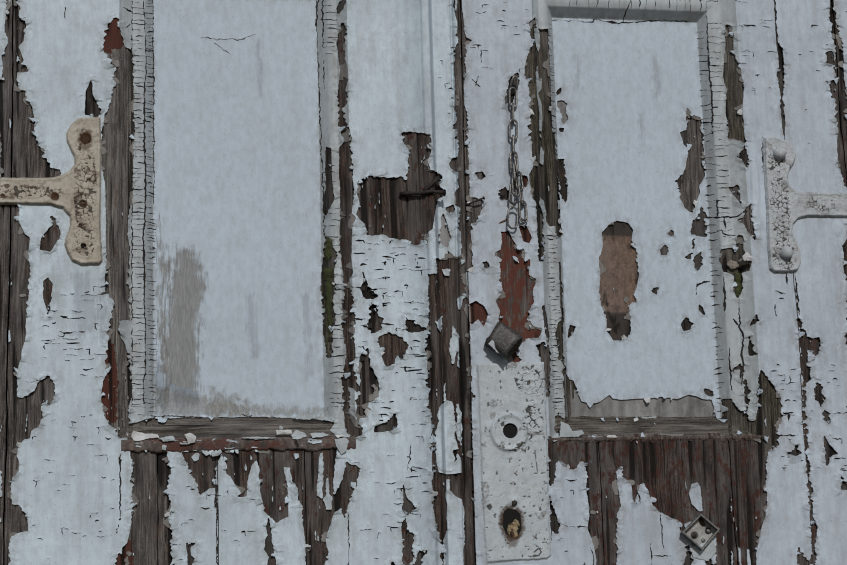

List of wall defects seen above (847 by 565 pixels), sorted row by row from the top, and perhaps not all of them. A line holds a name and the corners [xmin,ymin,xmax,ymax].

peeling [0,205,55,565]
peeling [0,0,61,178]
crack [43,285,109,376]
crack [126,0,202,420]
leakage [157,249,206,396]
crack [170,456,254,565]
peeling [85,18,361,565]
crack [292,0,433,565]
peeling [320,0,489,565]
peeling [495,18,782,565]
crack [546,0,778,420]
peeling [787,318,831,565]